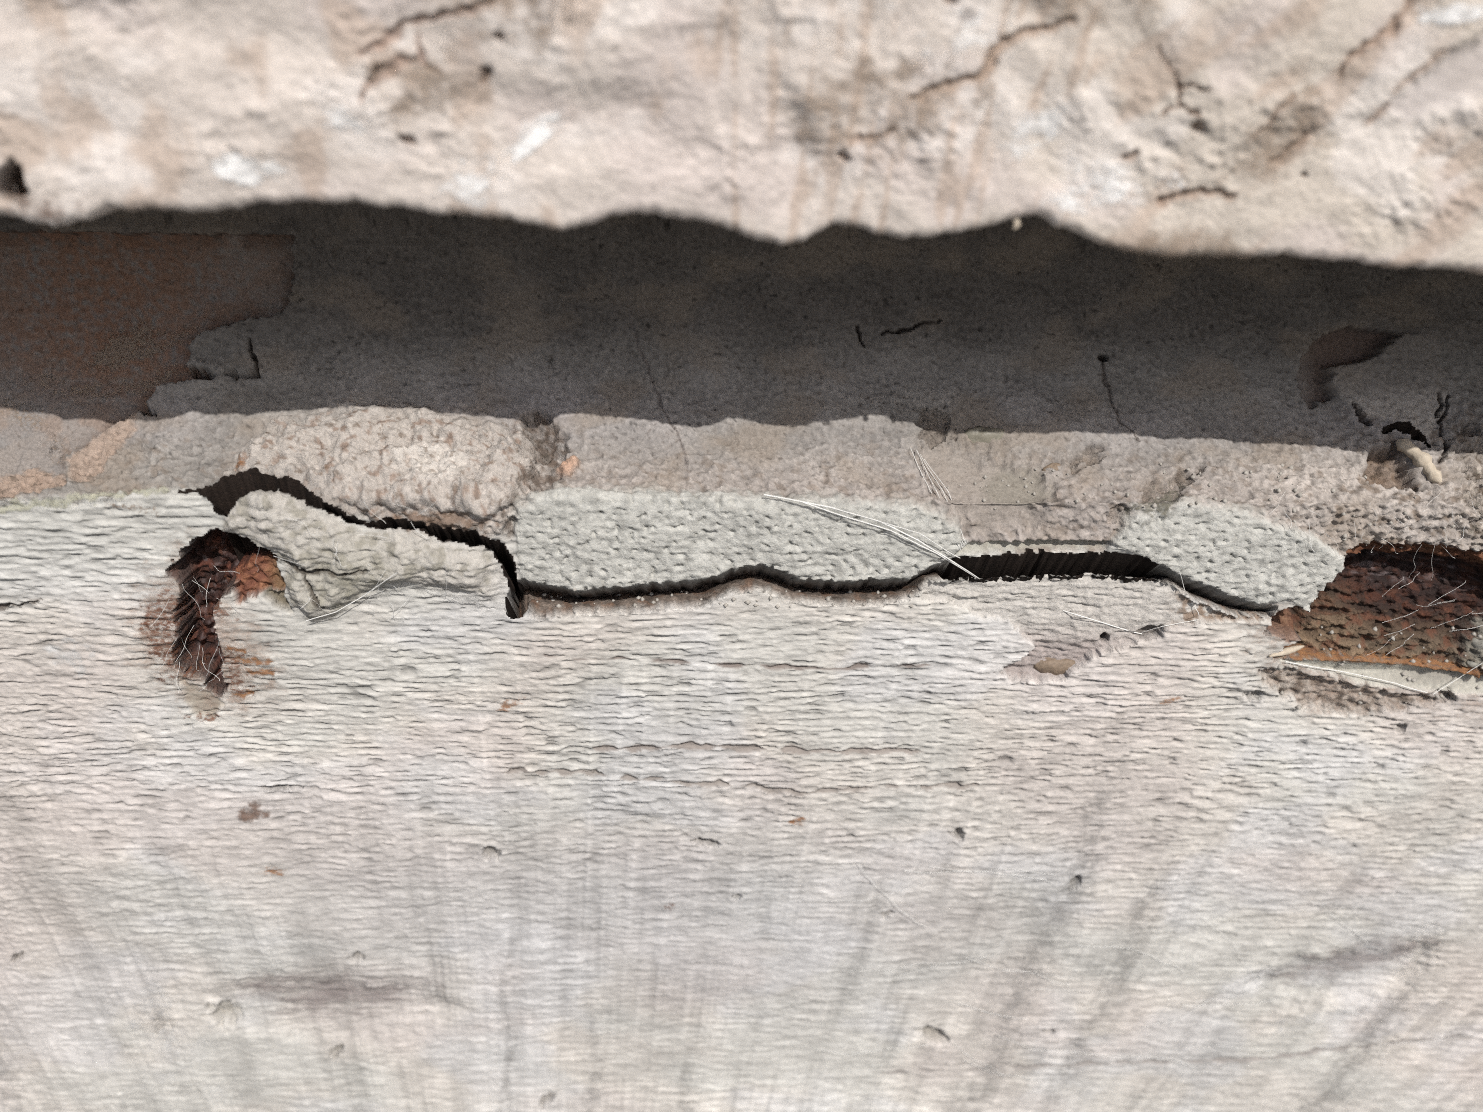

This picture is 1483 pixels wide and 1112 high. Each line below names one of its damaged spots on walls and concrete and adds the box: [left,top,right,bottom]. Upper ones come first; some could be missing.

peeling [1295,326,1450,440]
corrosion [140,528,292,701]
crack [177,467,1279,622]
spalling [909,404,1058,541]
spalling [921,423,1483,734]
corrosion [1280,639,1483,694]